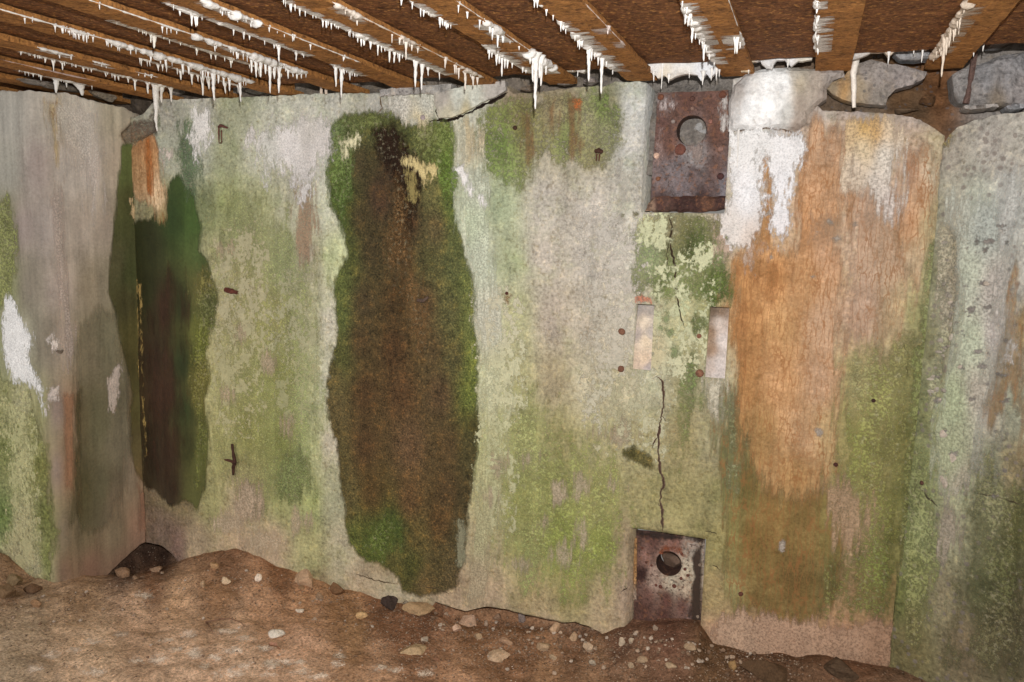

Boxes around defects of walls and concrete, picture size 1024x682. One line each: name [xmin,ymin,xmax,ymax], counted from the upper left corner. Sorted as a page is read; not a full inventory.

water stain [400,0,560,109]
water stain [533,0,626,94]
water stain [680,0,745,66]
corrosion [131,134,167,224]
water stain [0,0,365,509]
crack [666,215,684,325]
water stain [713,127,806,276]
corrosion [731,114,938,502]
water stain [0,295,59,575]
crack [652,376,666,531]
corrosion [637,531,703,620]
water stain [701,378,845,626]